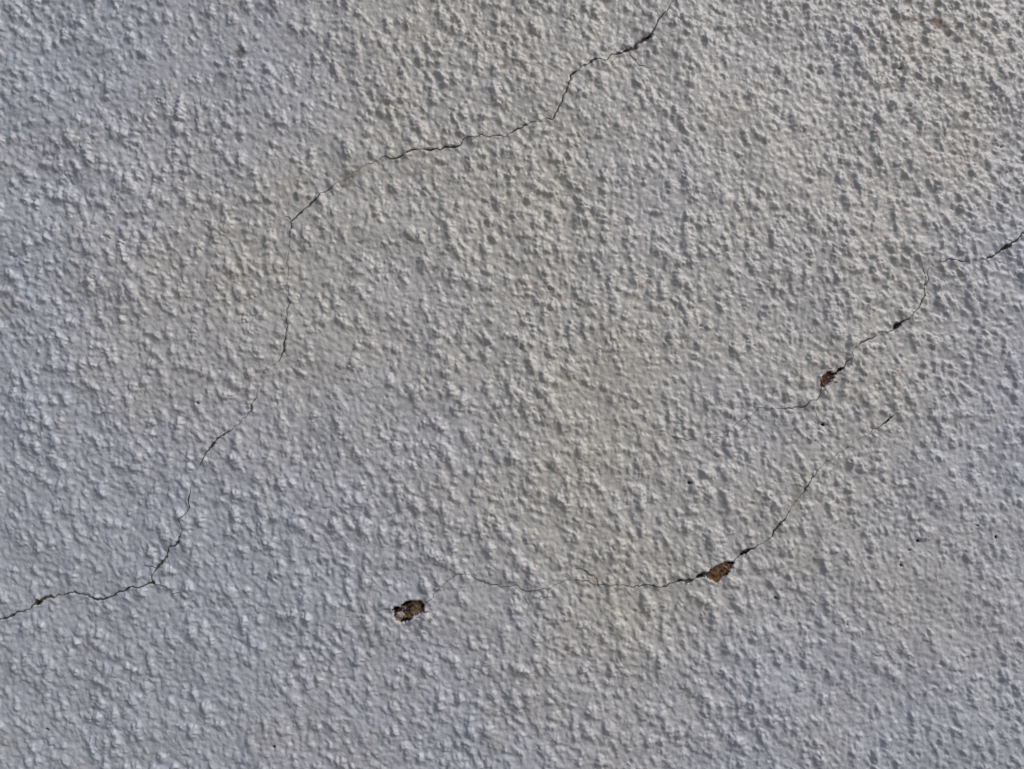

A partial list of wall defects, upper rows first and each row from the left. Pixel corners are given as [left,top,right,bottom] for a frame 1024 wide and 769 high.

crack [0,0,674,620]
spalling [820,368,838,387]
crack [664,232,1024,441]
spalling [392,600,433,622]
crack [378,415,894,612]
spalling [706,561,735,583]